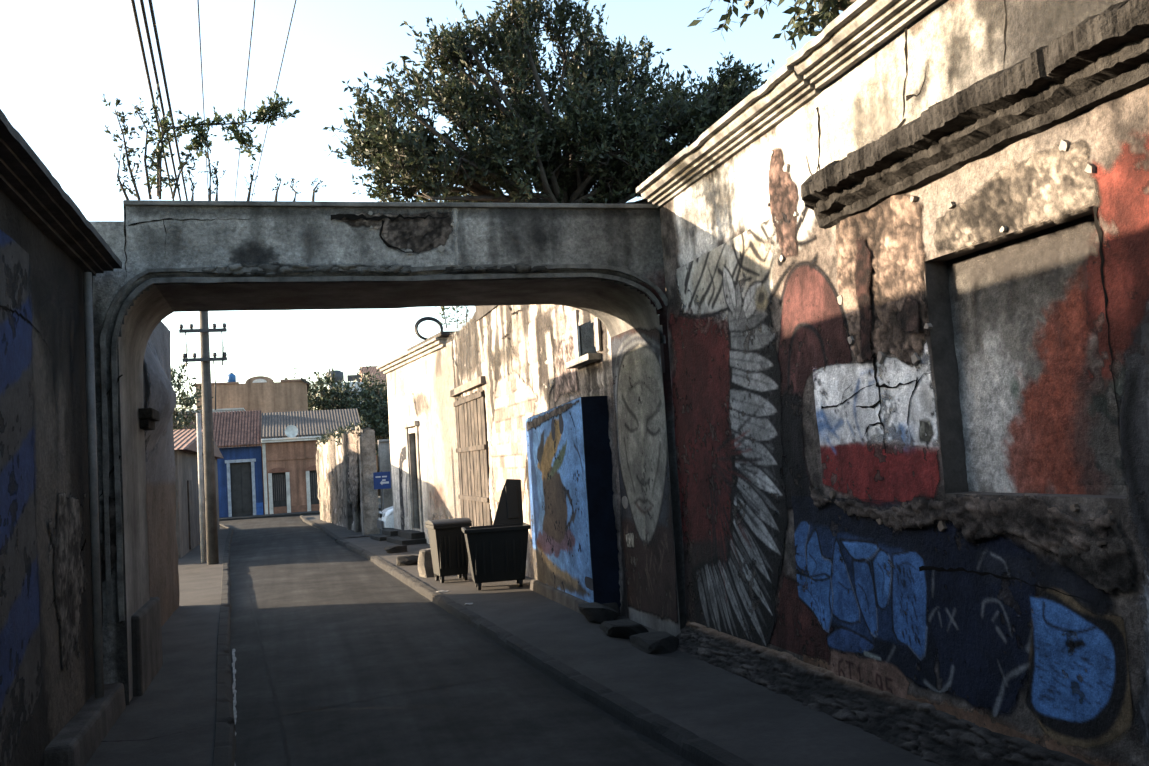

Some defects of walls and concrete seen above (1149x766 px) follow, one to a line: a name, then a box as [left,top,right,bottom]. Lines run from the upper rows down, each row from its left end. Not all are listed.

flaking render [189,211,455,275]
flaking render [445,264,547,273]
flaking render [835,139,1100,365]
crack [1093,205,1121,445]
flaking render [491,336,579,504]
crack [821,357,932,453]
flaking render [809,486,1114,558]